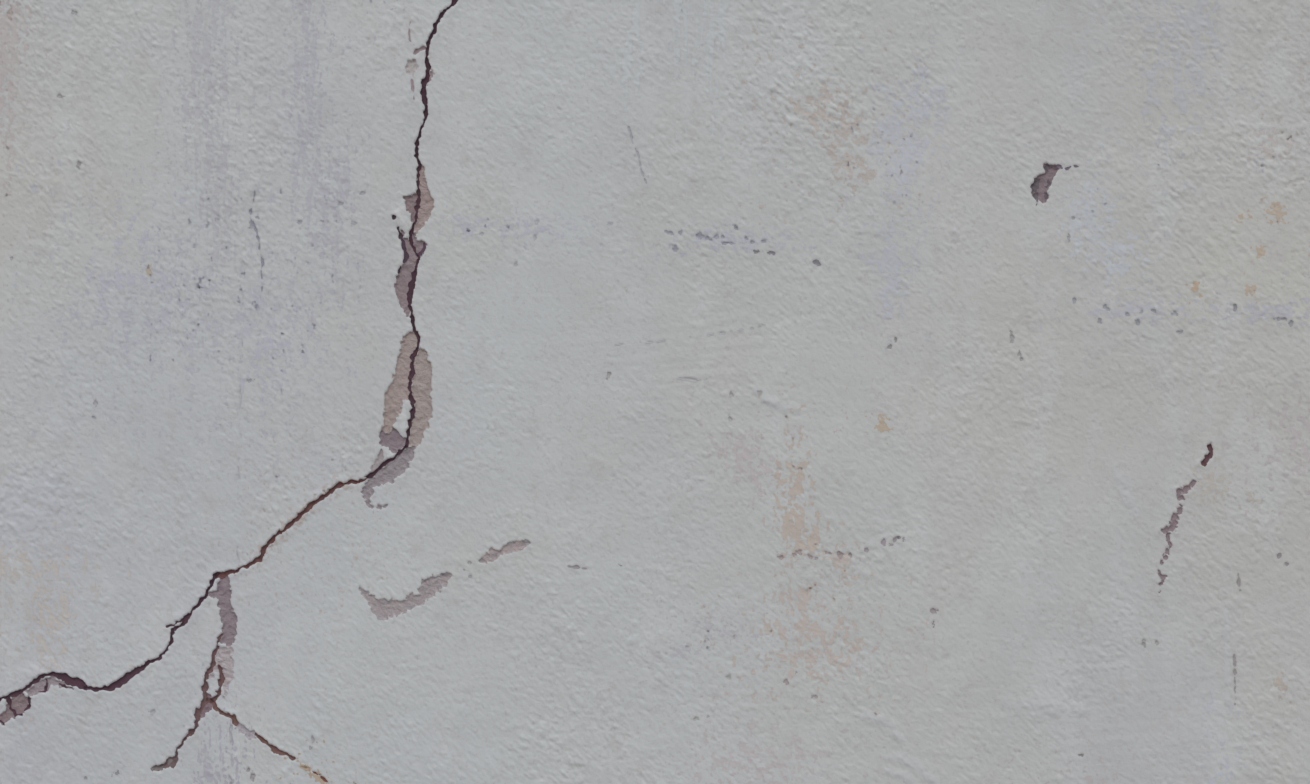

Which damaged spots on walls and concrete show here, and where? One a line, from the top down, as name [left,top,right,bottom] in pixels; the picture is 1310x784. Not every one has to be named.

flaking render [1030,163,1059,203]
crack [0,0,458,725]
flaking render [361,164,434,510]
flaking render [200,576,238,718]
crack [177,634,356,784]
flaking render [358,539,531,621]
crack [1158,444,1213,593]